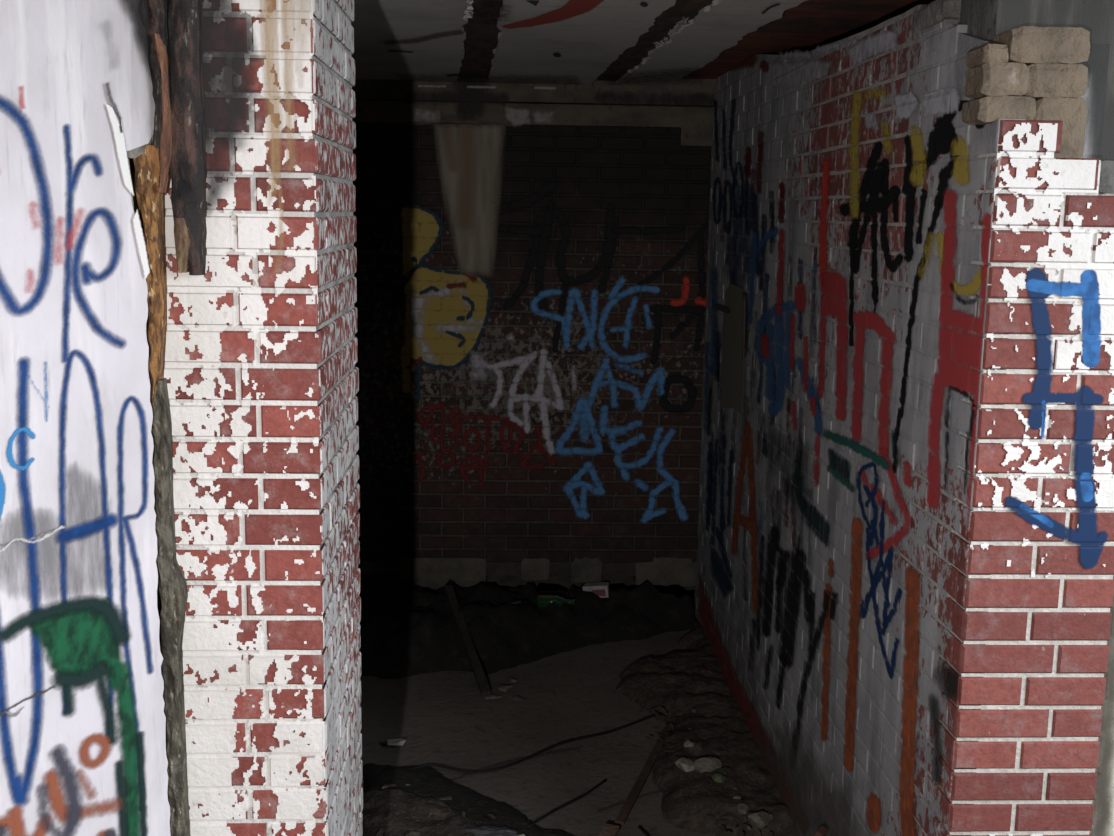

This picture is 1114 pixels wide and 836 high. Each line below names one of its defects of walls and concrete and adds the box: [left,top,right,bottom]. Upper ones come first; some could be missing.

peeling [106,83,156,279]
corrosion [265,0,289,190]
peeling [767,31,897,88]
peeling [895,26,1114,511]
peeling [164,0,326,836]
peeling [974,403,1077,546]